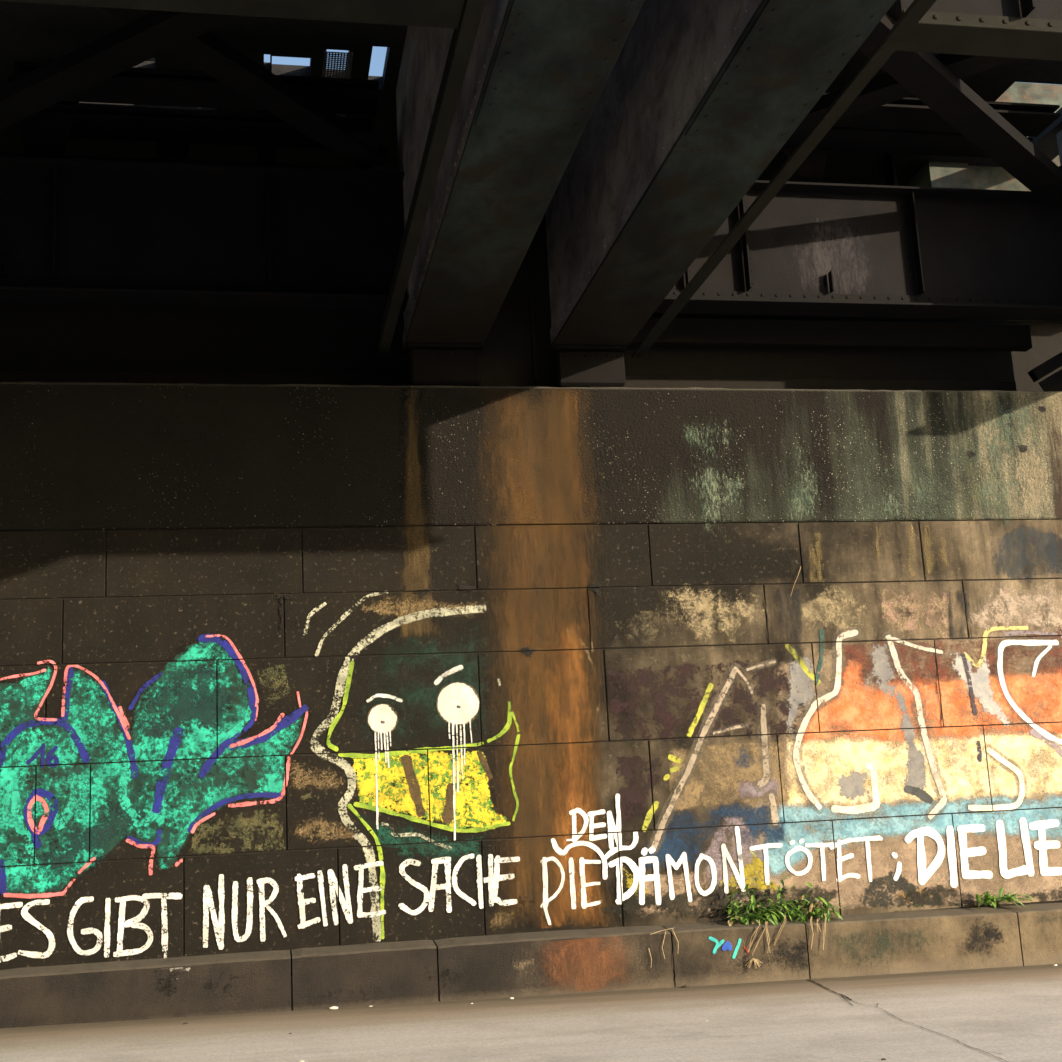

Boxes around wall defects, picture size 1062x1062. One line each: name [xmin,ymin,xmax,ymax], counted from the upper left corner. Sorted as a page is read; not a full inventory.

corrosion [399,400,433,637]
damp [684,420,744,532]
damp [783,446,817,521]
damp [967,401,1062,583]
corrosion [492,389,605,919]
crack [808,979,1007,1062]